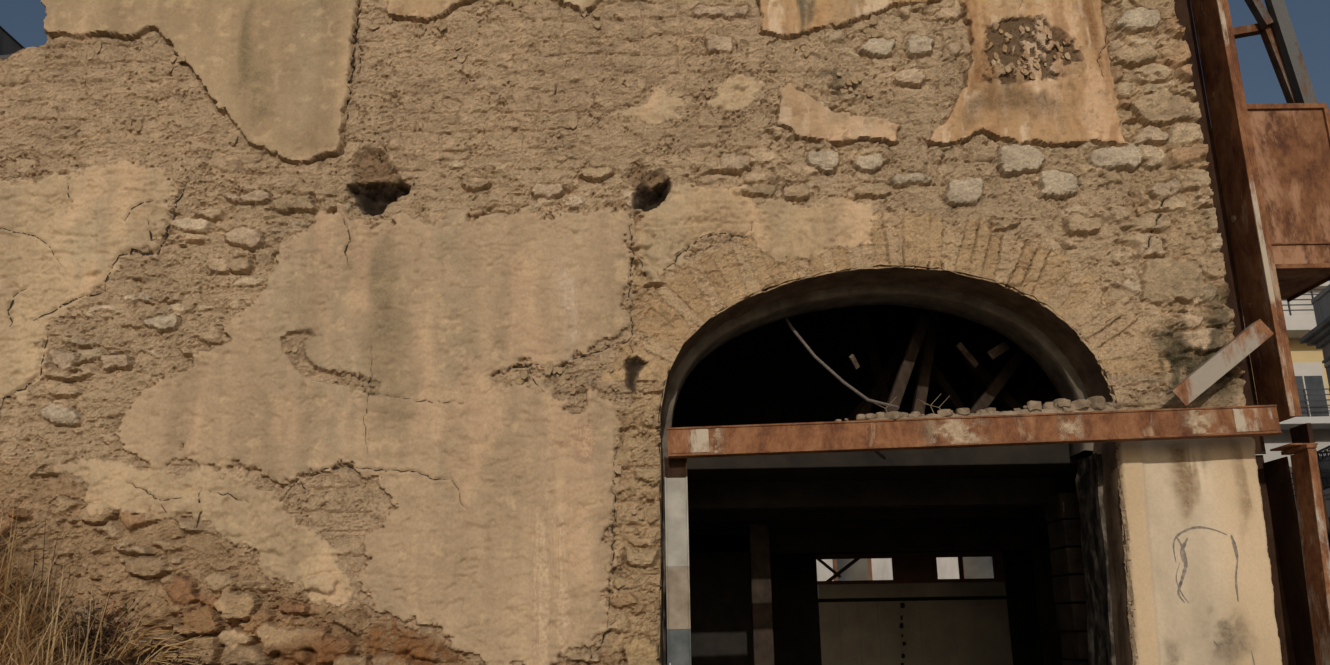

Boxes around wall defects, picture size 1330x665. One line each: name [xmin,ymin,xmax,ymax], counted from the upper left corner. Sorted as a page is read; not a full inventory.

crack [343,1,363,154]
spalling [0,0,1087,217]
crack [0,181,189,409]
spalling [280,329,381,396]
crack [132,483,248,528]
spalling [0,439,475,665]
spalling [492,341,662,665]